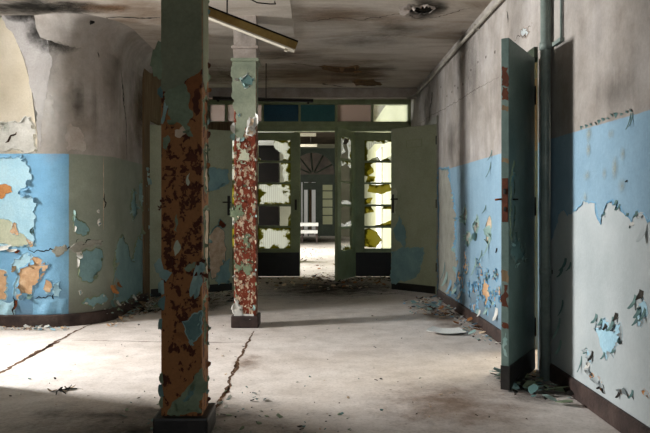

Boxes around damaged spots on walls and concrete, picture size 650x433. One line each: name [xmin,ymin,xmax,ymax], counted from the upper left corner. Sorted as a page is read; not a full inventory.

peeling [399,3,436,16]
peeling [150,41,190,154]
peeling [0,15,62,310]
crack [0,324,97,373]
peeling [52,210,103,284]
peeling [79,224,151,314]
peeling [158,361,211,416]
peeling [154,62,258,346]
crack [216,331,254,408]
peeling [436,166,509,357]
peeling [551,199,650,427]